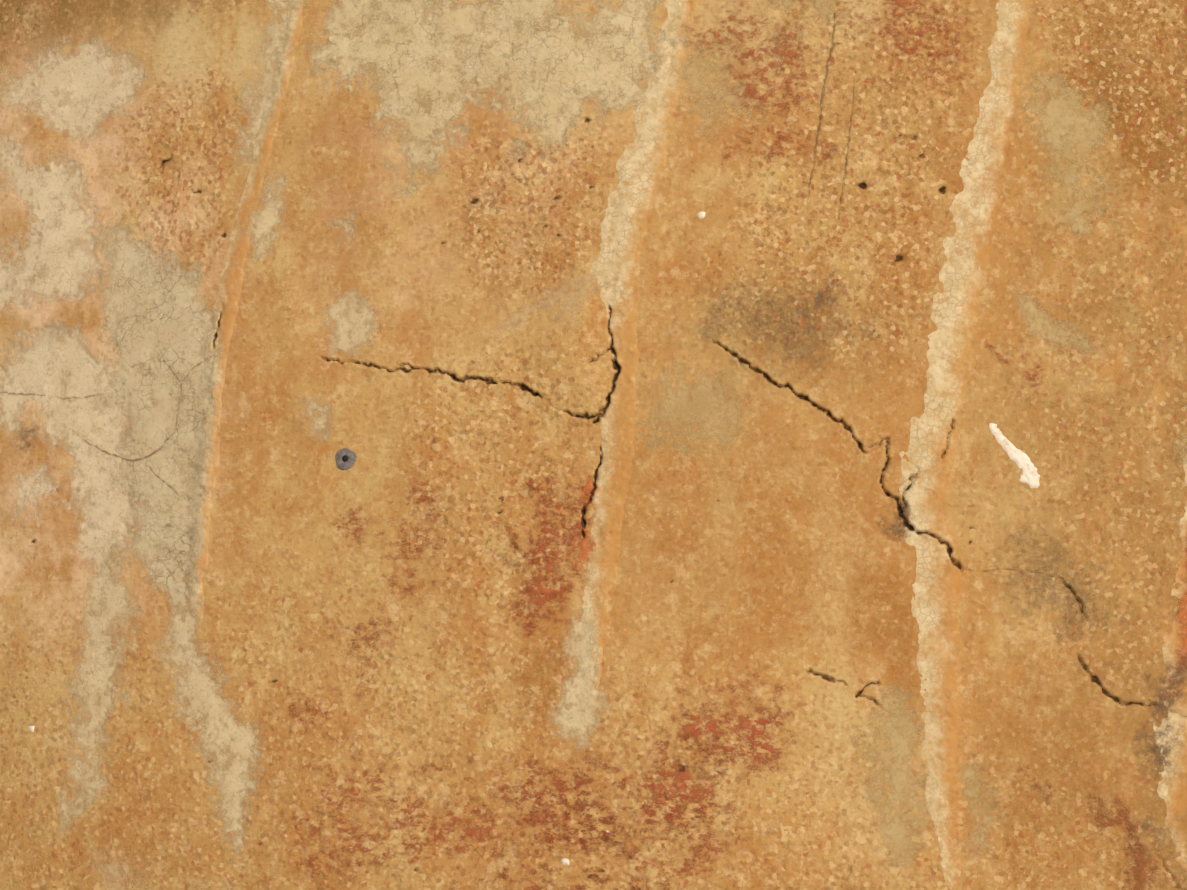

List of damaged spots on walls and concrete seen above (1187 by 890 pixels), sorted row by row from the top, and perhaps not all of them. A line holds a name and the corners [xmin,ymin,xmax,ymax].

crack [328,360,539,396]
crack [569,307,620,423]
crack [581,455,602,538]
crack [718,344,961,569]
crack [809,670,877,703]
crack [1078,657,1155,706]